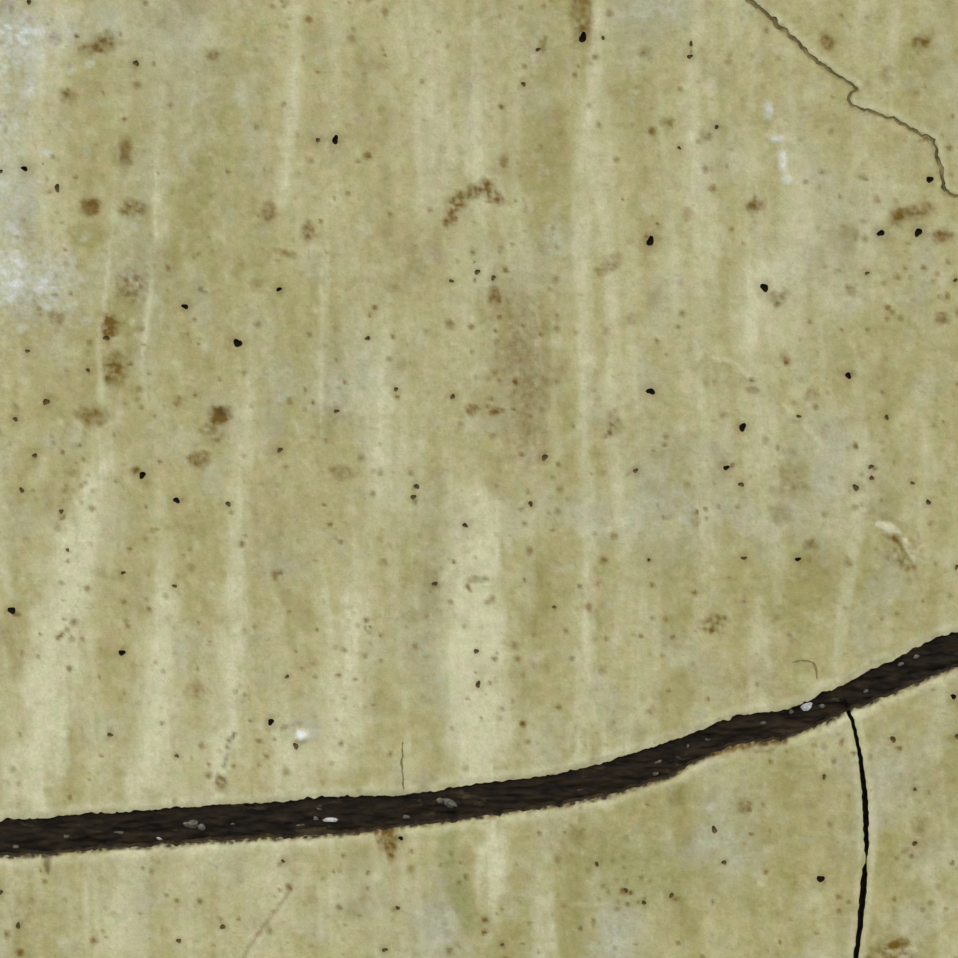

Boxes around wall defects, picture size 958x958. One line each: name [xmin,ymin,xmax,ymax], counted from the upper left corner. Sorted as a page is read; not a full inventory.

crack [745,0,958,198]
crack [0,632,958,958]